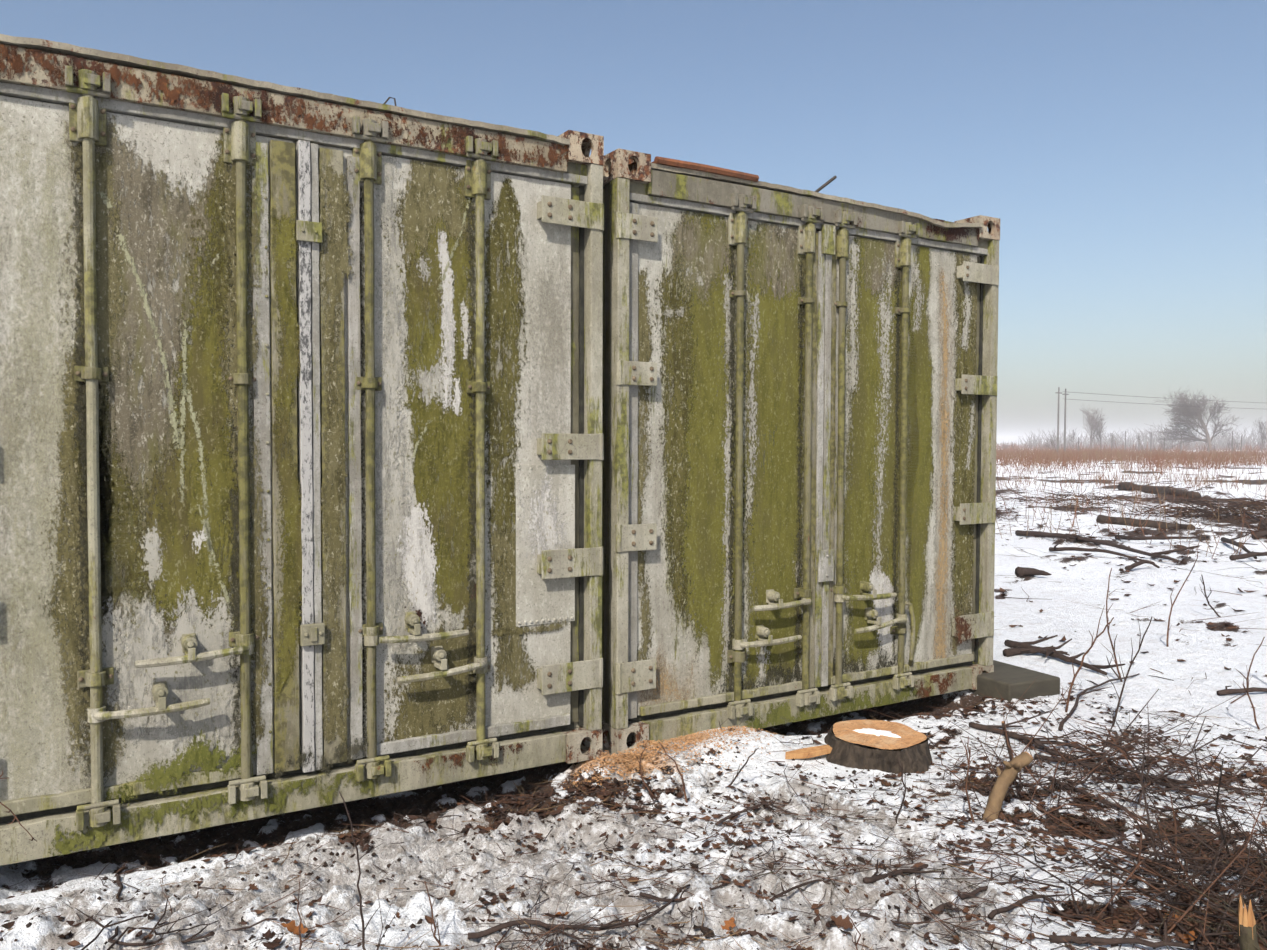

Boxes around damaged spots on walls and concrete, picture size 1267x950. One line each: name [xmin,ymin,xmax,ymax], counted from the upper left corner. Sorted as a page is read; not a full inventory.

water stain [68,144,85,366]
rust [0,43,568,171]
water stain [74,382,90,670]
water stain [81,687,91,787]
water stain [227,387,241,755]
water stain [465,202,476,729]
water stain [719,246,805,693]
water stain [833,268,901,676]